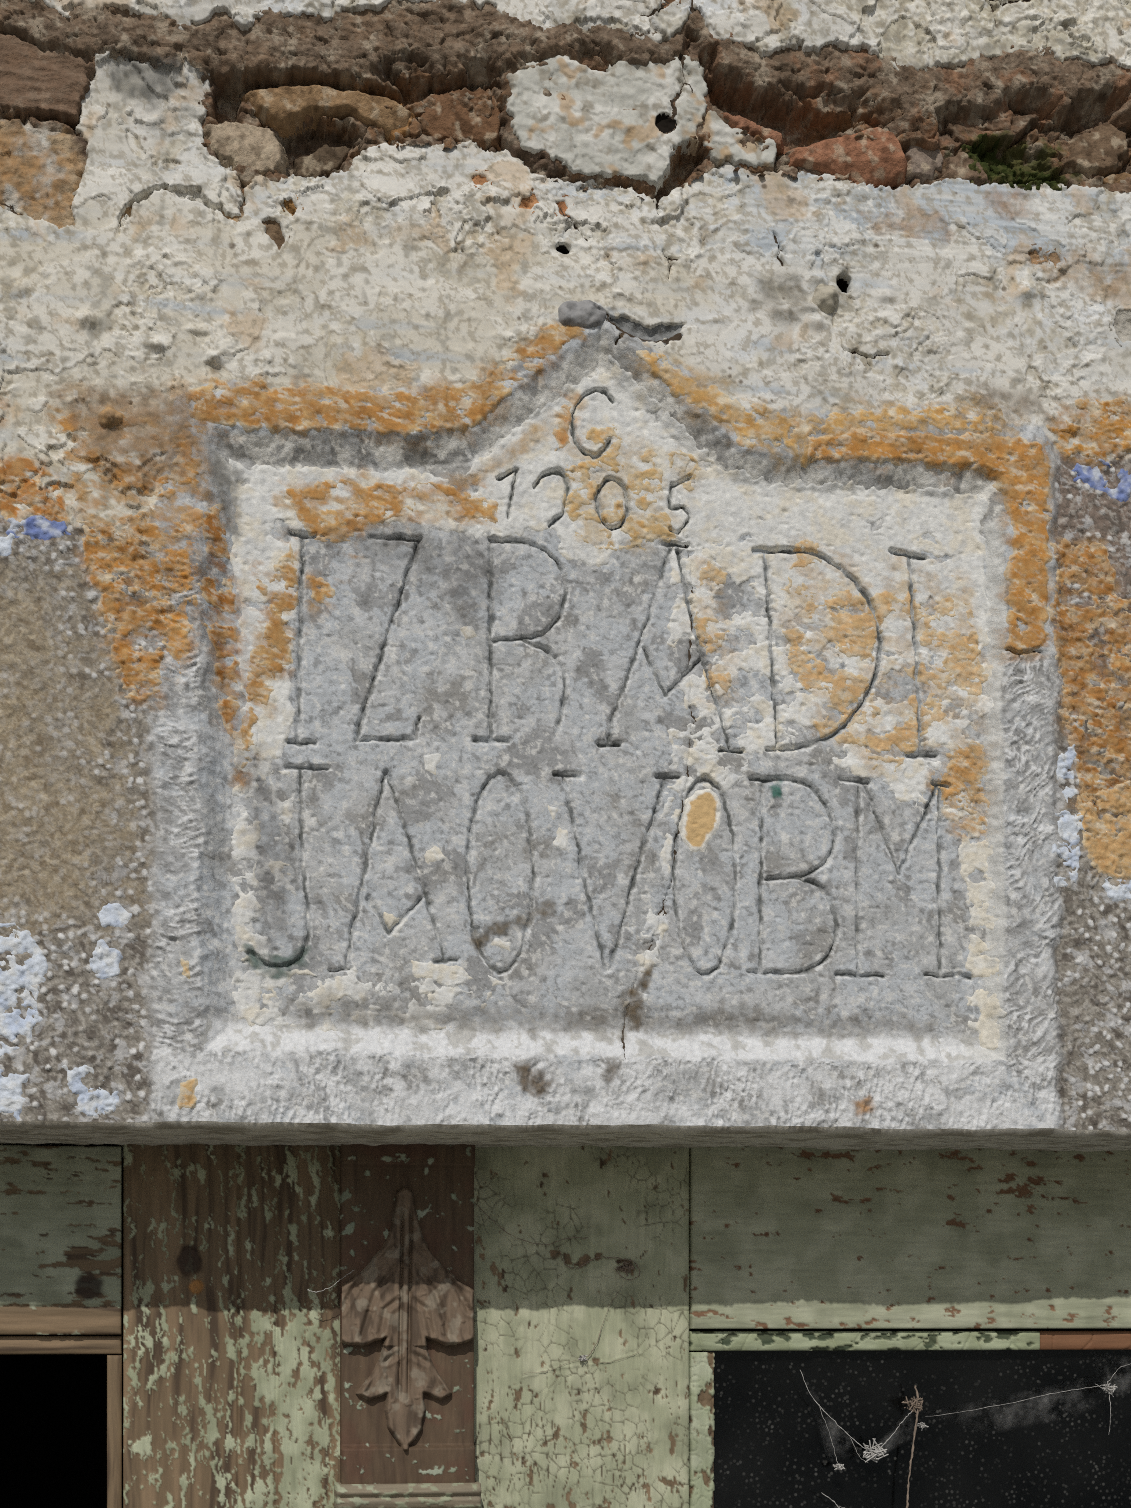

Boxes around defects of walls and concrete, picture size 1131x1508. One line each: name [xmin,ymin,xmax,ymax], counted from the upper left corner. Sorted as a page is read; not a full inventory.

crack [640,0,696,17]
spalling [0,0,1131,229]
spalling [262,195,304,250]
spalling [1028,243,1066,271]
spalling [836,275,851,293]
peeling [0,314,1131,1050]
peeling [0,923,48,1121]
peeling [62,1065,119,1117]
peeling [177,1078,198,1109]